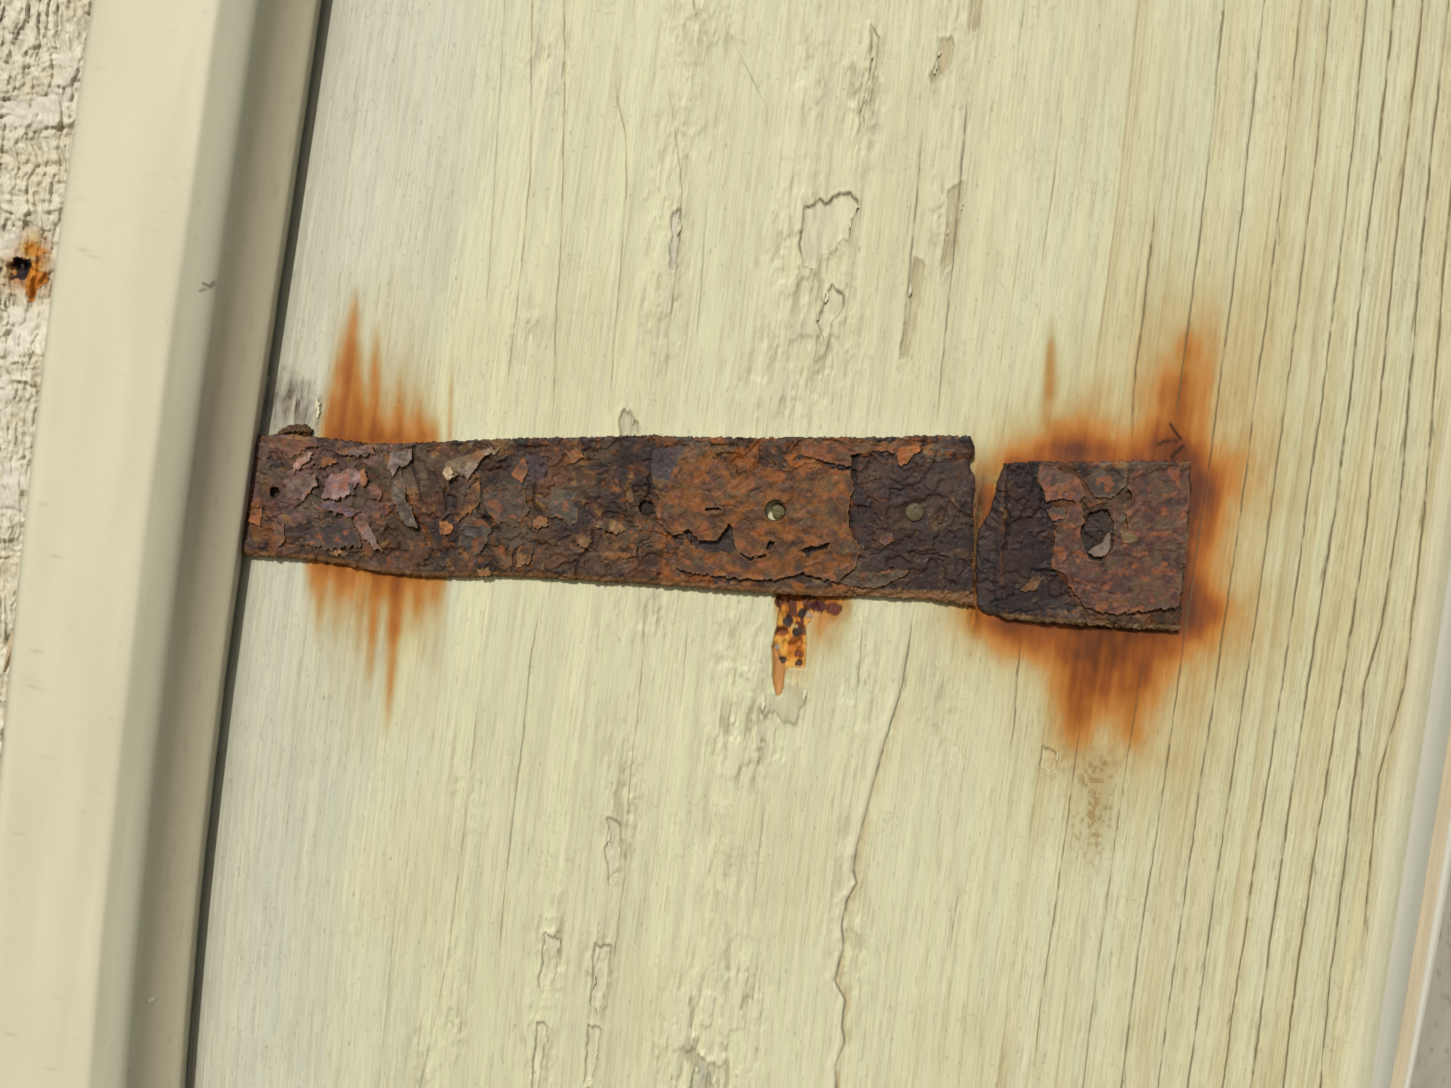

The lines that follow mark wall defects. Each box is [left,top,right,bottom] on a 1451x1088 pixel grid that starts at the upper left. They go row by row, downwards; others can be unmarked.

corrosion [10,237,48,303]
peeling [798,191,859,270]
peeling [816,285,845,342]
corrosion [248,311,445,697]
corrosion [439,446,637,576]
corrosion [655,439,922,637]
corrosion [957,331,1247,752]
peeling [584,944,611,1088]